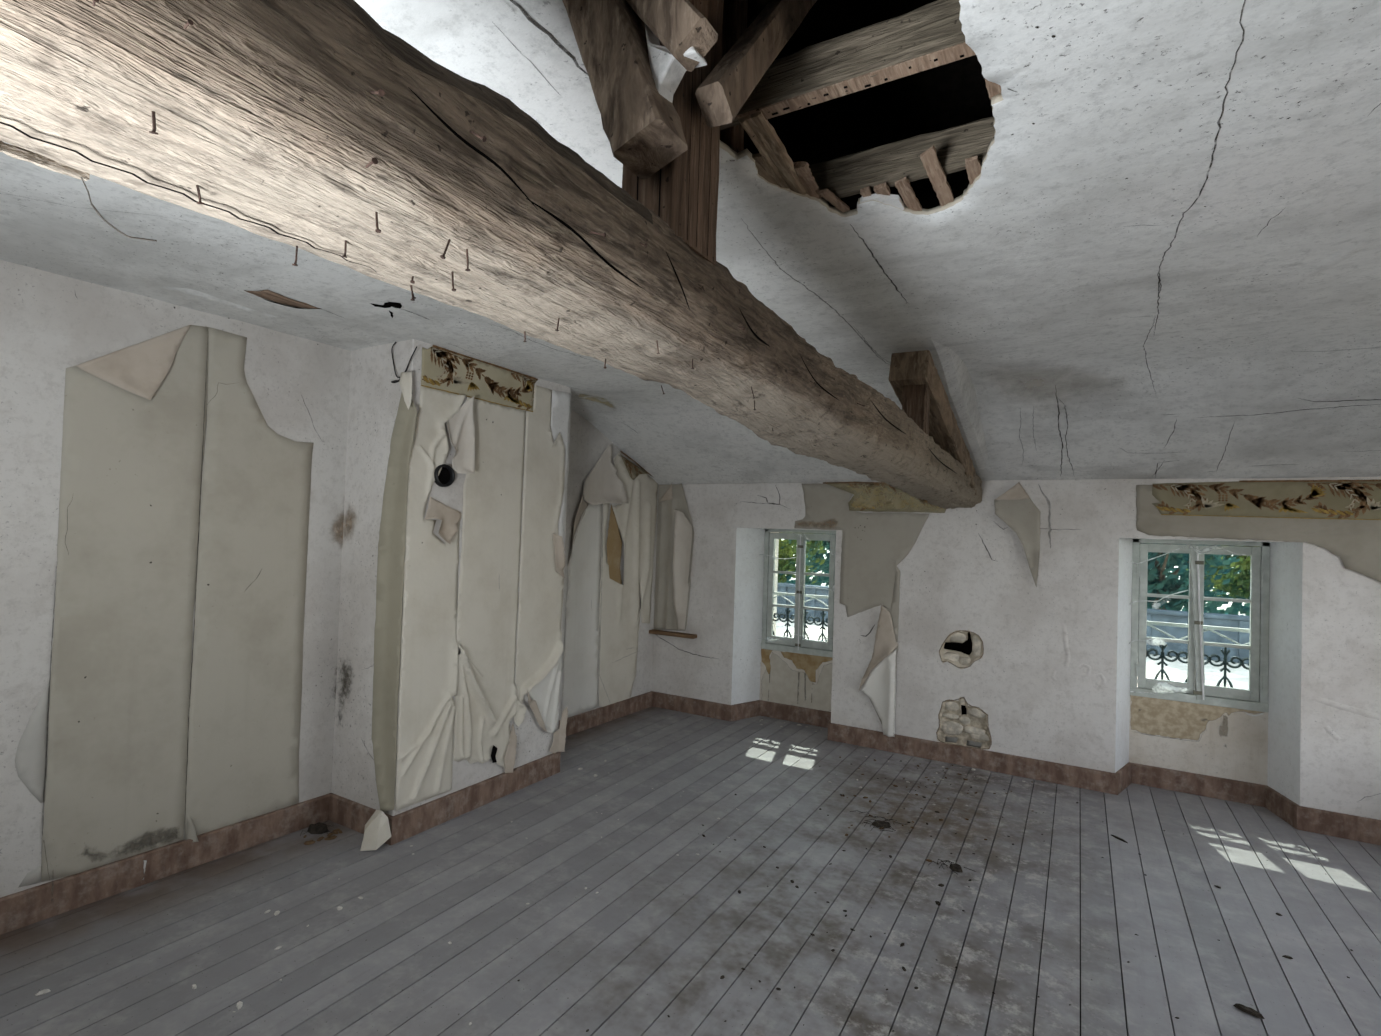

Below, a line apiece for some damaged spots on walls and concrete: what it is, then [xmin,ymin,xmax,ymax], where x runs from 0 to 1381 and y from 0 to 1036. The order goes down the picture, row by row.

crack [495,0,588,91]
crack [1125,0,1381,478]
crack [1019,385,1074,477]
hole [939,630,984,669]
flaking render [936,697,992,750]